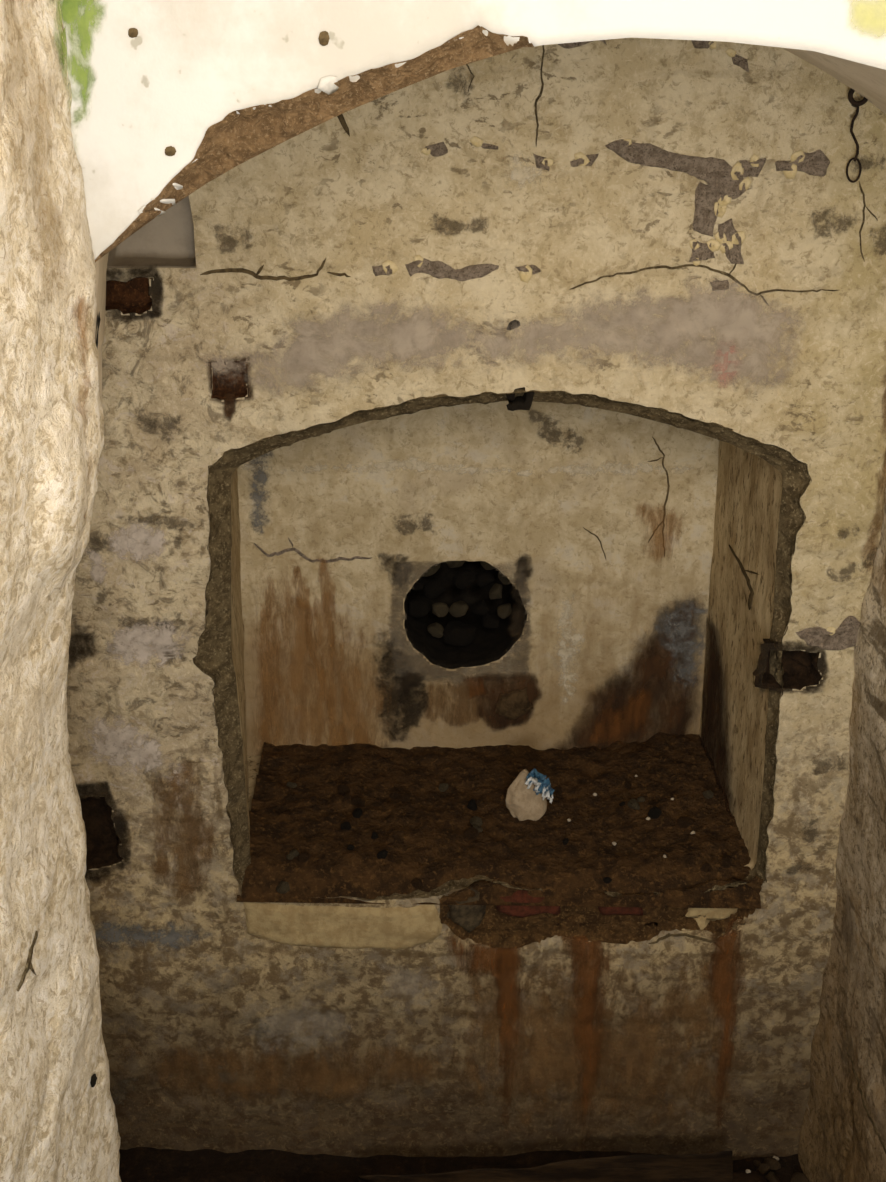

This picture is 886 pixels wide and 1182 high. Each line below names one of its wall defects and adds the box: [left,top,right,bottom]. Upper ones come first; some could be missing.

flaking render [95,25,534,347]
flaking render [533,153,554,171]
flaking render [570,139,830,266]
crack [200,258,351,281]
crack [569,263,838,305]
flaking render [709,280,729,291]
spalling [209,358,252,421]
rust [298,560,368,746]
rust [450,938,520,1099]
rust [562,935,609,1108]
rust [709,918,743,1125]
crack [846,1049,886,1154]